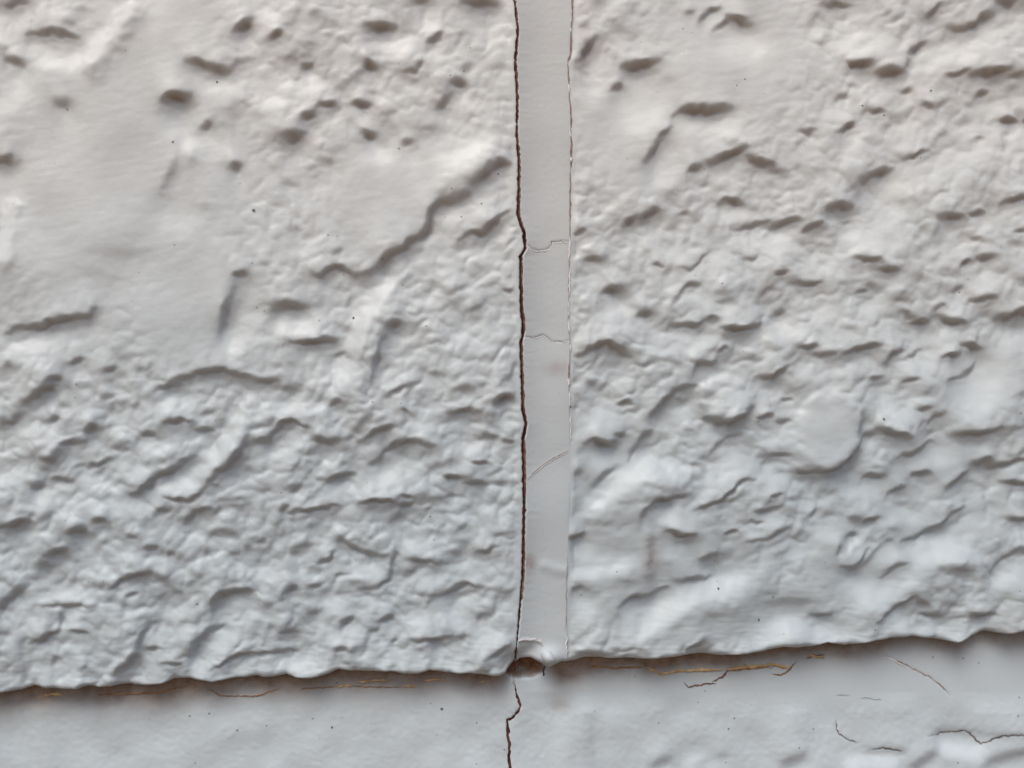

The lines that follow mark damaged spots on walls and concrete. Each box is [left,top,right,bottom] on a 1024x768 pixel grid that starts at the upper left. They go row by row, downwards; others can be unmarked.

crack [506,0,573,768]
crack [884,656,947,691]
crack [930,730,1024,745]